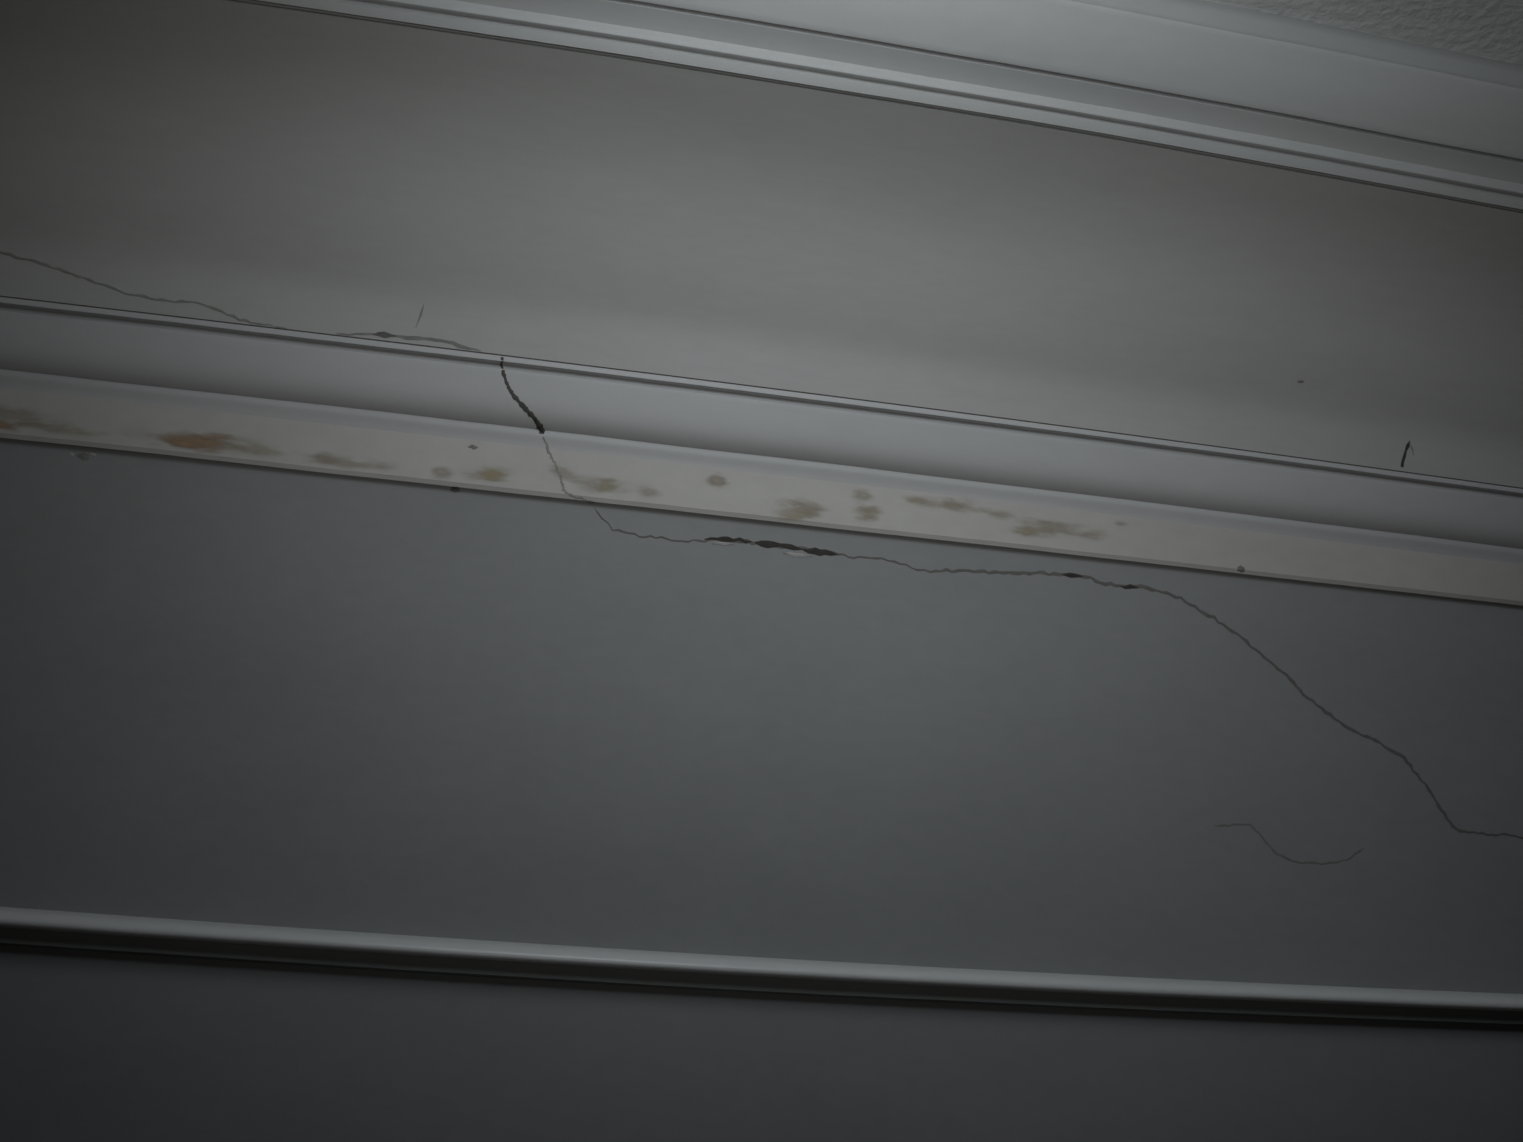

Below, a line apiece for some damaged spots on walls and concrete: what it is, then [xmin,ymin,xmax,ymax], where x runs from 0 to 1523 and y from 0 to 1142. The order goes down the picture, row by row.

crack [0,251,286,329]
crack [336,303,1523,839]